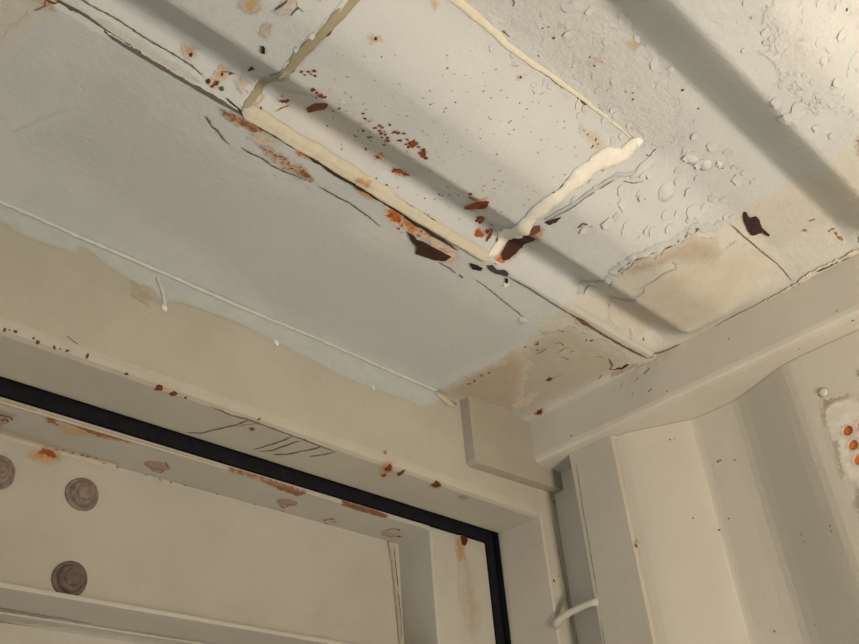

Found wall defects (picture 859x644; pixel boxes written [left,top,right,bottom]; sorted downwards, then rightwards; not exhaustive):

rust [219,108,317,183]
rust [268,79,430,186]
rust [417,170,504,242]
leakage [606,241,780,341]